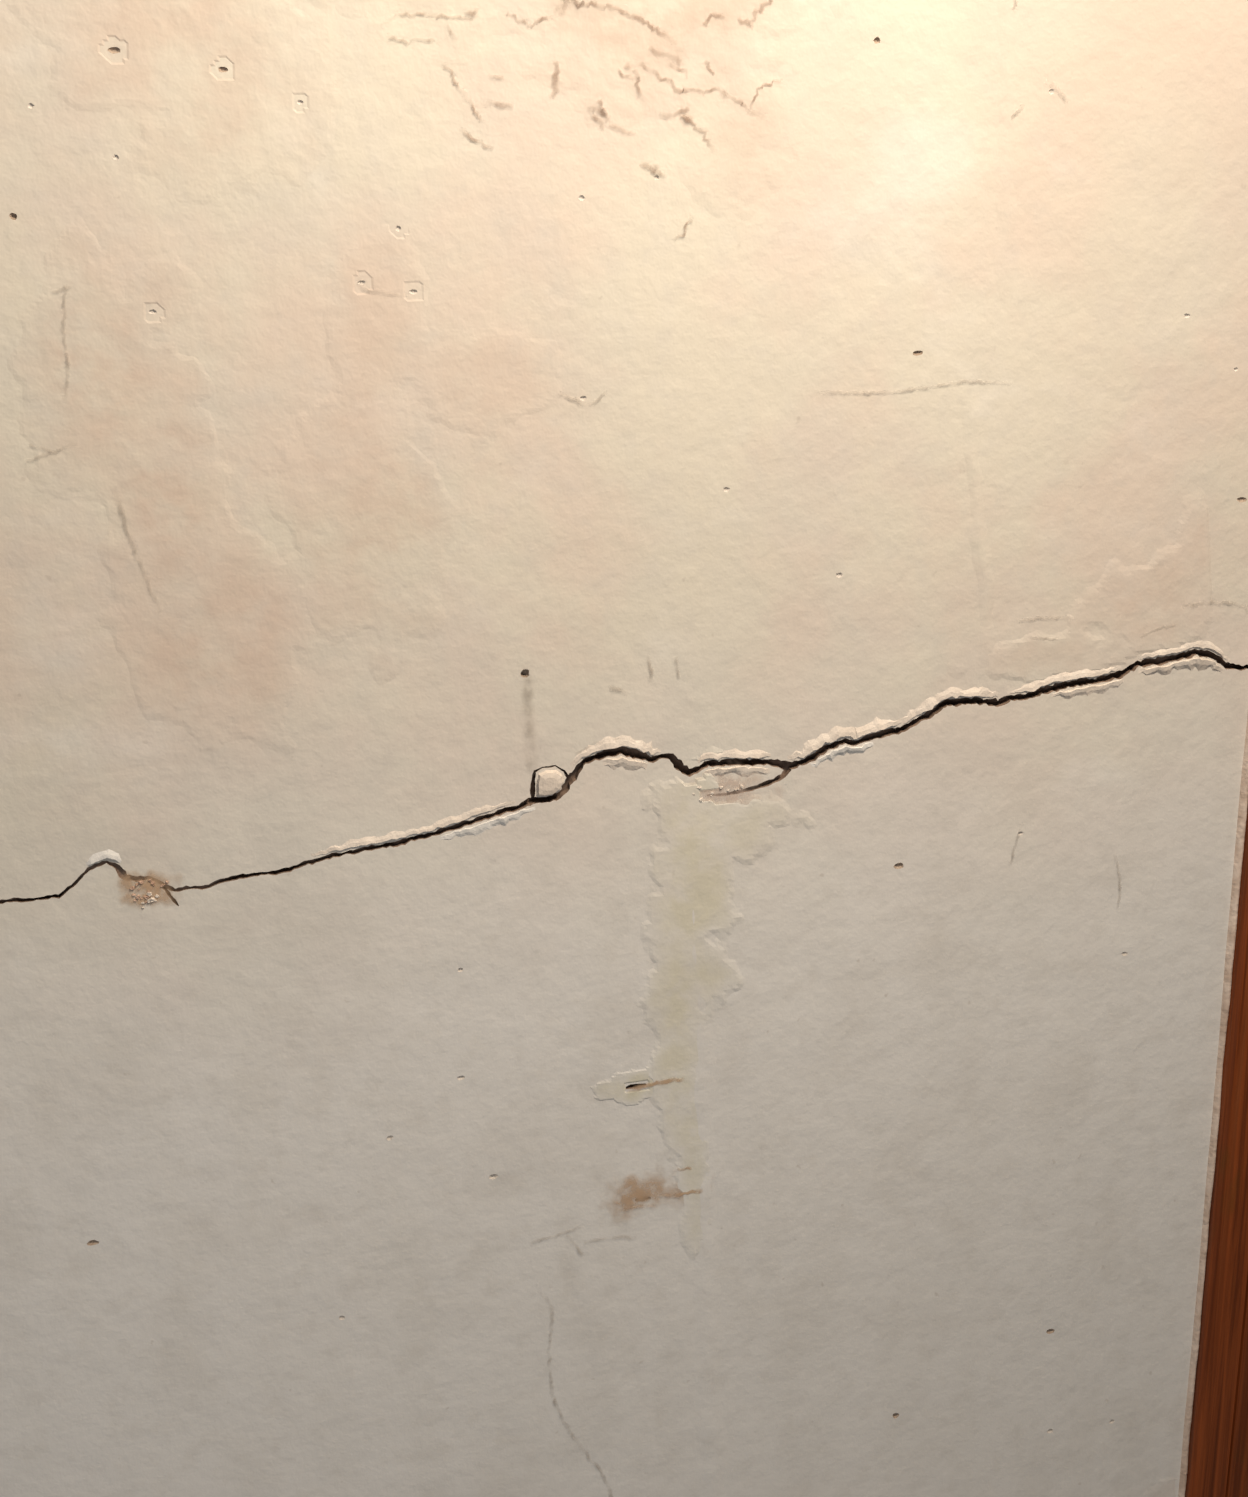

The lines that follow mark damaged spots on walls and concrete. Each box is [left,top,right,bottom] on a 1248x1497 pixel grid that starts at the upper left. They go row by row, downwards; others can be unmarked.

crack [0,641,1248,906]
rust [617,1179,696,1208]